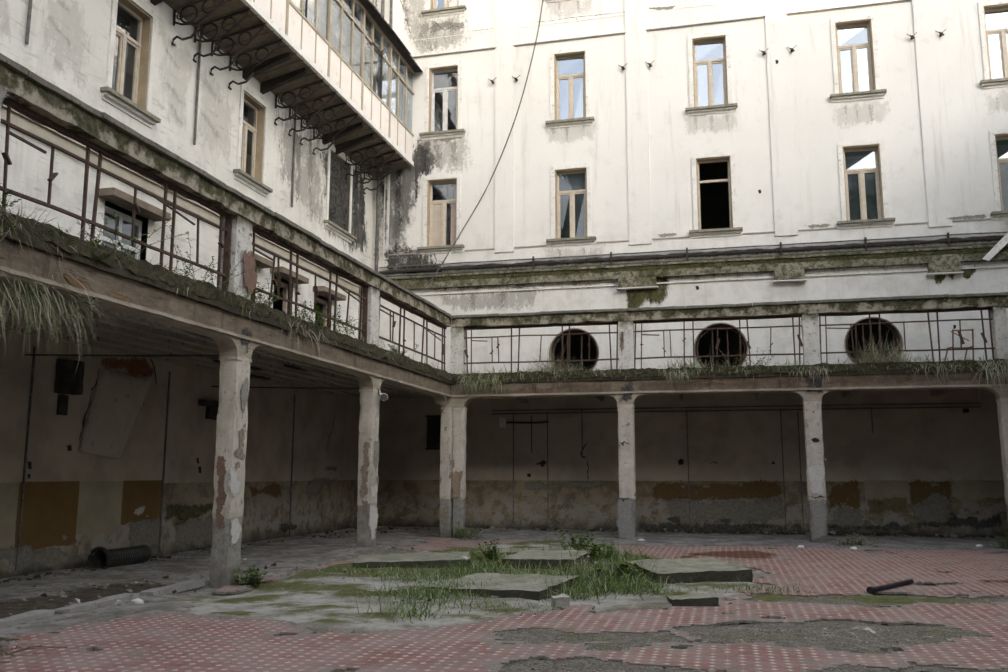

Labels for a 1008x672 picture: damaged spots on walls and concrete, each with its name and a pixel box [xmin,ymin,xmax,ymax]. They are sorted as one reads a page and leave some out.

leakage [320,140,441,282]
leakage [628,275,664,307]
flaking render [175,378,290,548]
flaking render [359,439,380,539]
flaking render [128,505,163,548]
leakage [639,516,802,532]
leakage [827,498,1002,531]